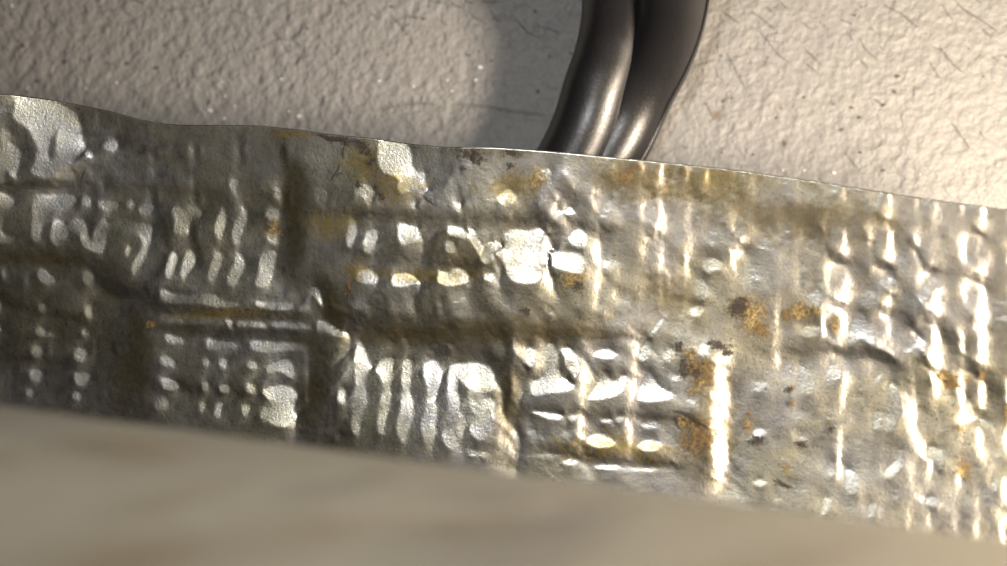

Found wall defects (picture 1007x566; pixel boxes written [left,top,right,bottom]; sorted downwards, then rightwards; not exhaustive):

rust [731,293,773,341]
rust [782,301,841,334]
rust [685,347,721,396]
rust [678,414,725,460]